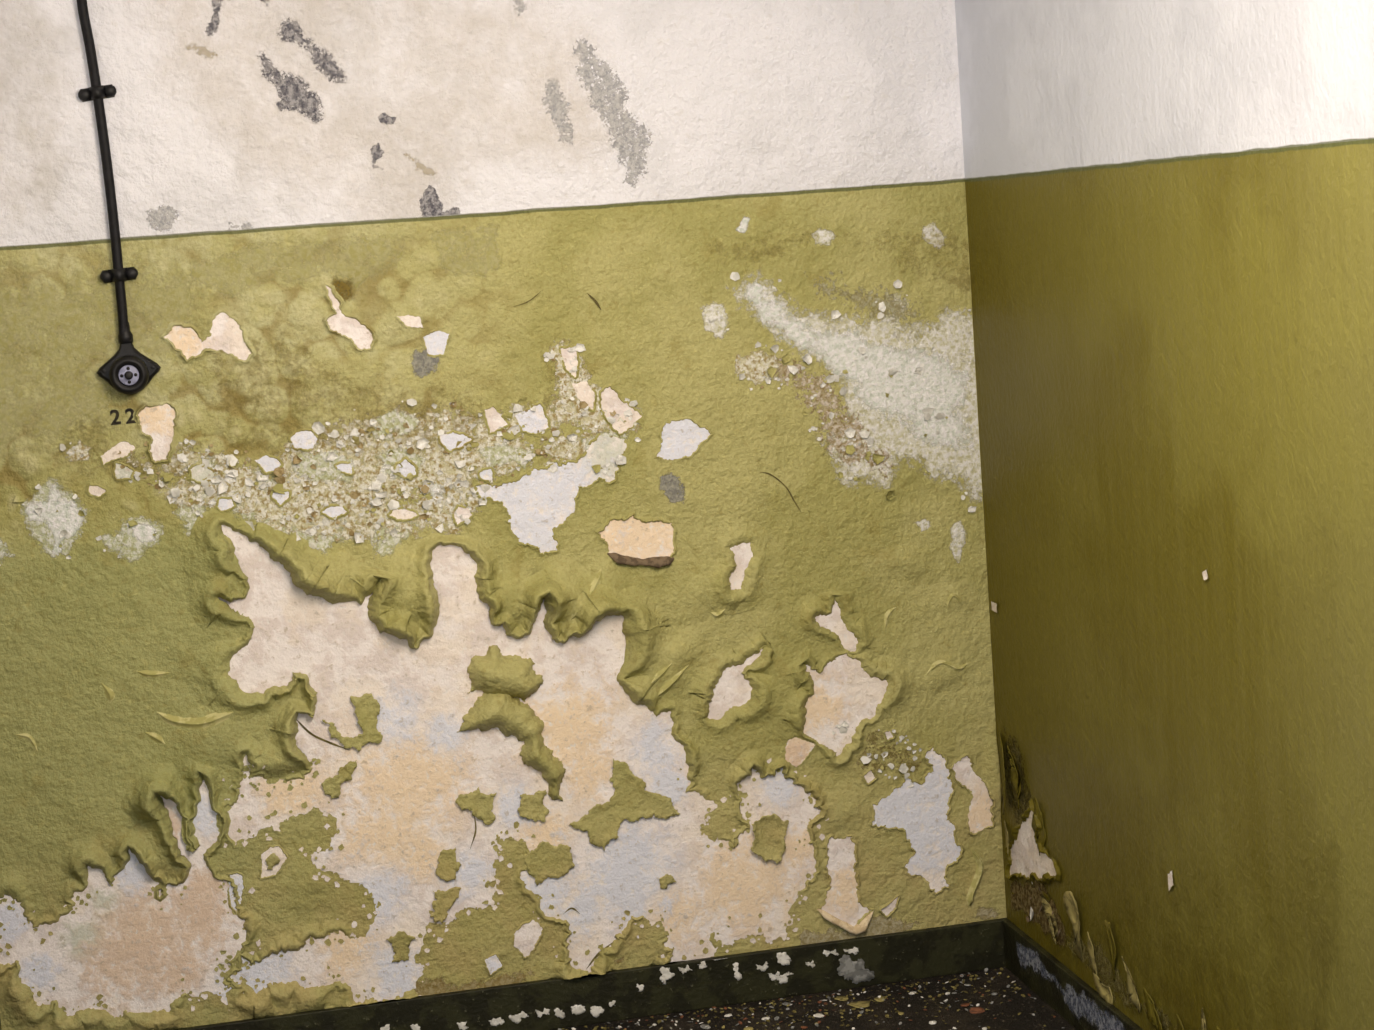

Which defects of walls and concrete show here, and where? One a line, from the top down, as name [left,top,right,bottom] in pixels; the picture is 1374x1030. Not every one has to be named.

peeling [161,308,256,365]
leakage [701,271,982,563]
peeling [0,339,1220,1030]